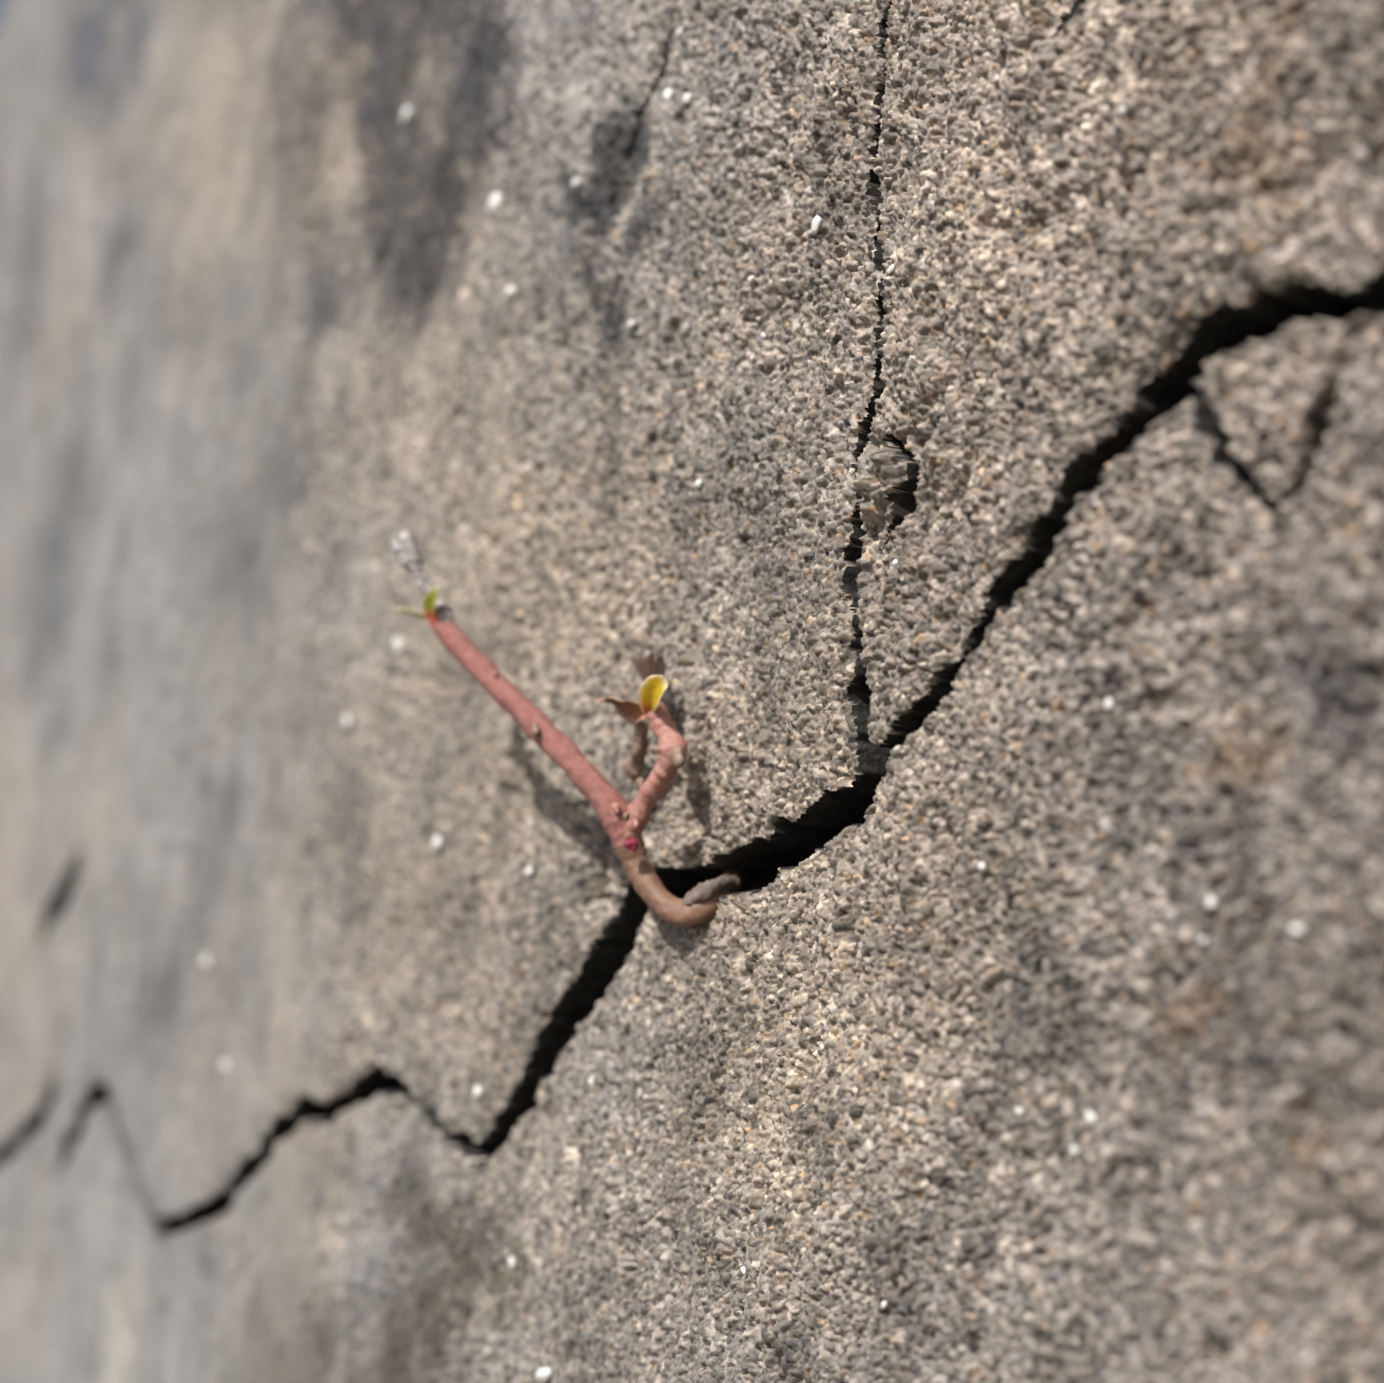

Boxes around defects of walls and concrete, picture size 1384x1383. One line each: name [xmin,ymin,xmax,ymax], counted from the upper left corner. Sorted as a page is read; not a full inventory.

crack [640,1,676,111]
crack [653,0,1384,899]
crack [0,882,649,1240]